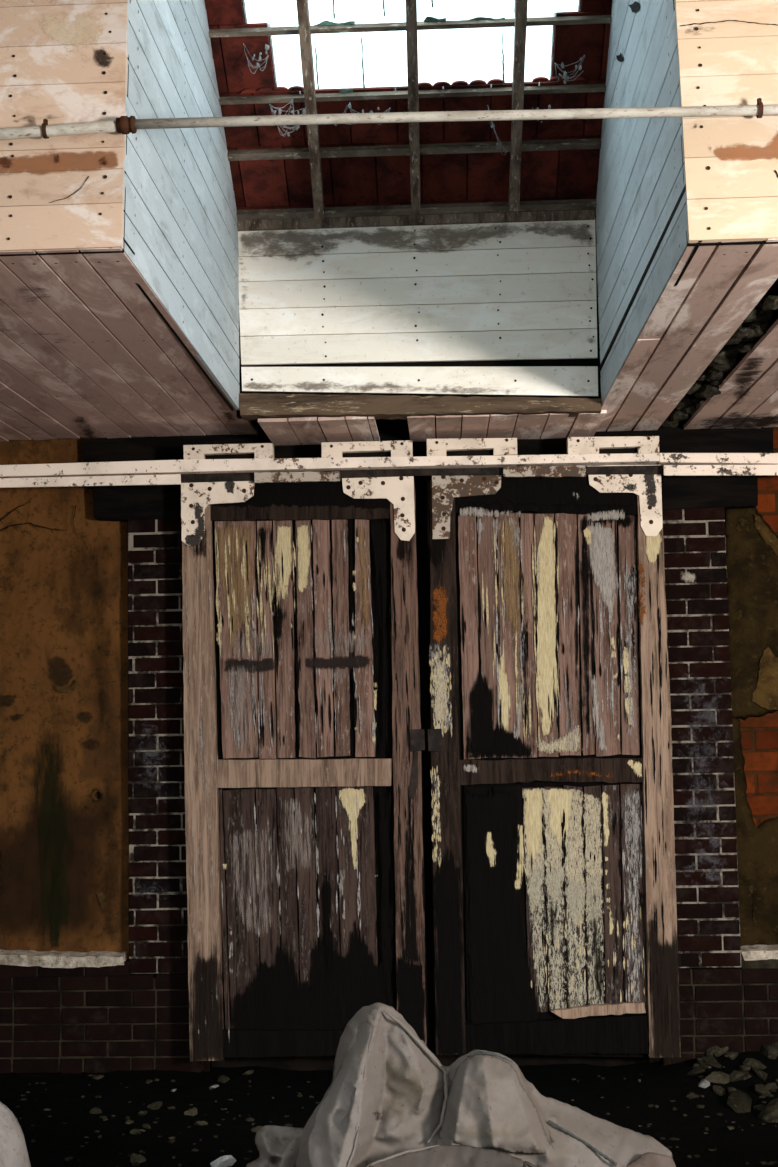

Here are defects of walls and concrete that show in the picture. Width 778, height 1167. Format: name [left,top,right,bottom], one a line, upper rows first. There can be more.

crack [680,19,778,27]
crack [0,502,78,536]
peeling [185,502,205,546]
peeling [216,525,271,750]
peeling [276,525,310,600]
peeling [319,526,369,654]
leakage [0,799,108,929]
peeling [485,832,496,867]
peeling [515,760,644,1009]
flaking render [732,718,778,946]